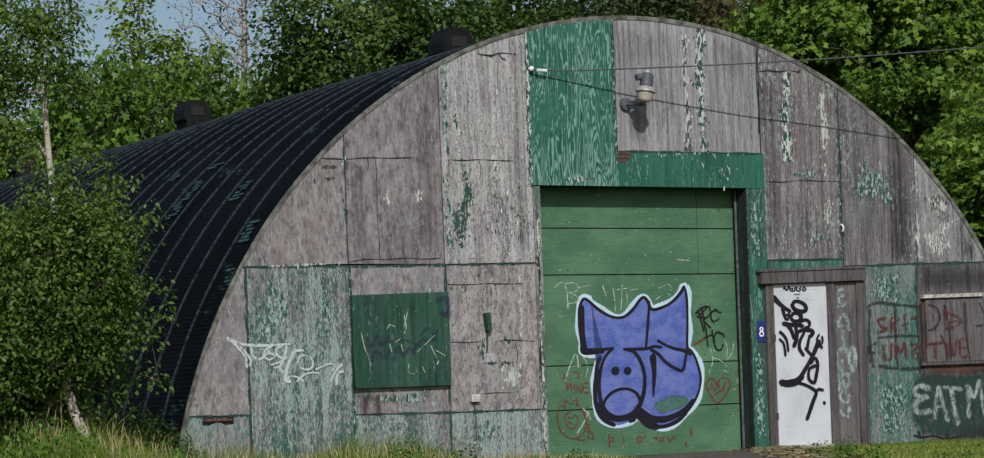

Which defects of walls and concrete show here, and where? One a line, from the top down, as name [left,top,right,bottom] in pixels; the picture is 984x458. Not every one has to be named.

peeling [262,261,340,338]
peeling [440,32,599,453]
peeling [610,23,738,190]
peeling [777,70,899,260]
peeling [866,271,910,305]
peeling [870,377,912,436]